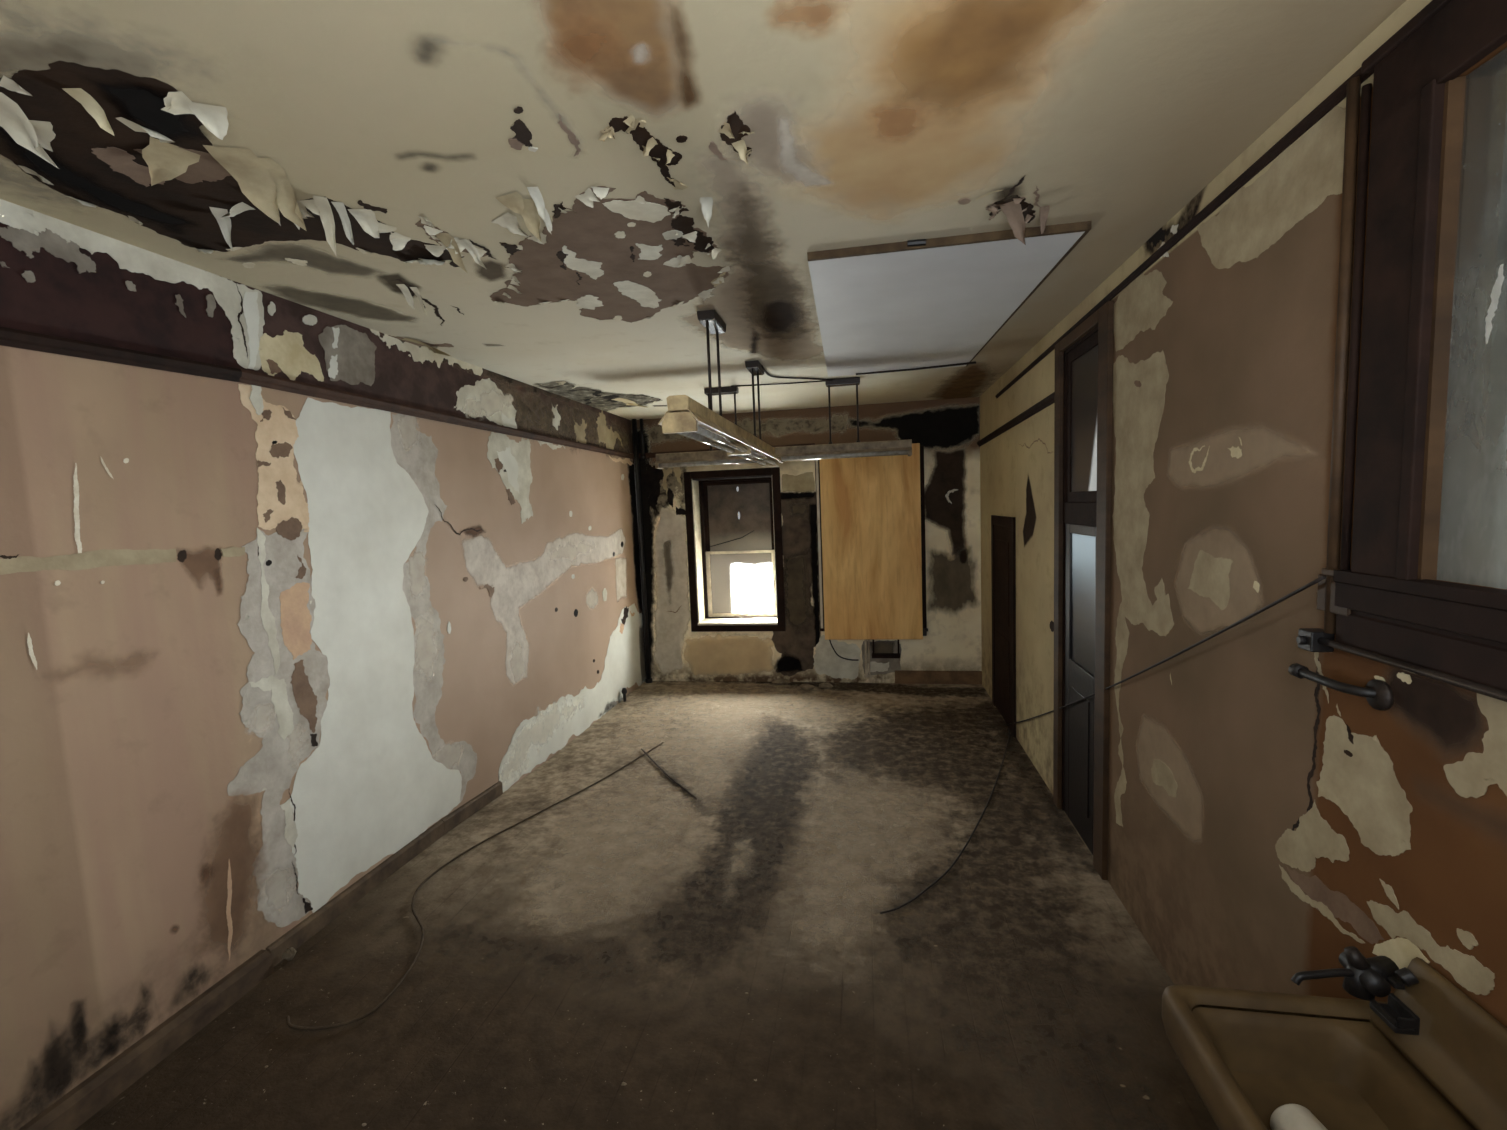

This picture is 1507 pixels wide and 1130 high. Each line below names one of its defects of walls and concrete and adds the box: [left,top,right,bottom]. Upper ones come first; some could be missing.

spalling [0,61,732,415]
leakage [541,0,698,114]
leakage [686,0,1085,359]
leakage [173,799,260,1005]
flaking render [285,398,462,913]
peeling [370,329,565,524]
flaking render [498,508,690,792]
leakage [734,363,993,612]
peeling [1112,270,1261,841]
peeling [1275,715,1495,995]
peeling [1444,693,1507,798]
leakage [0,987,152,1130]